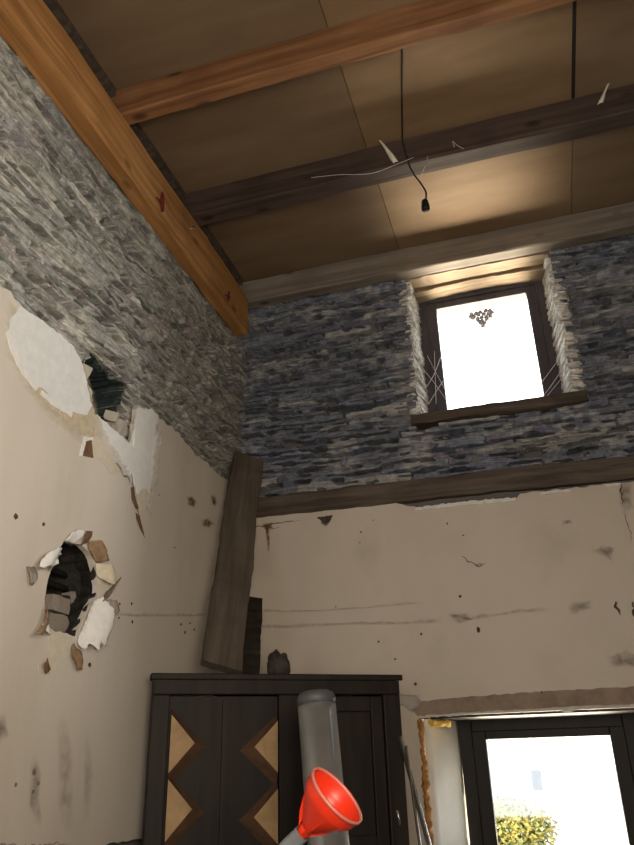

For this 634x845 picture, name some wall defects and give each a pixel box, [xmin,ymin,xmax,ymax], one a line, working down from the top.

flaking render [5,306,127,475]
spalling [27,528,121,676]
flaking render [413,686,634,718]